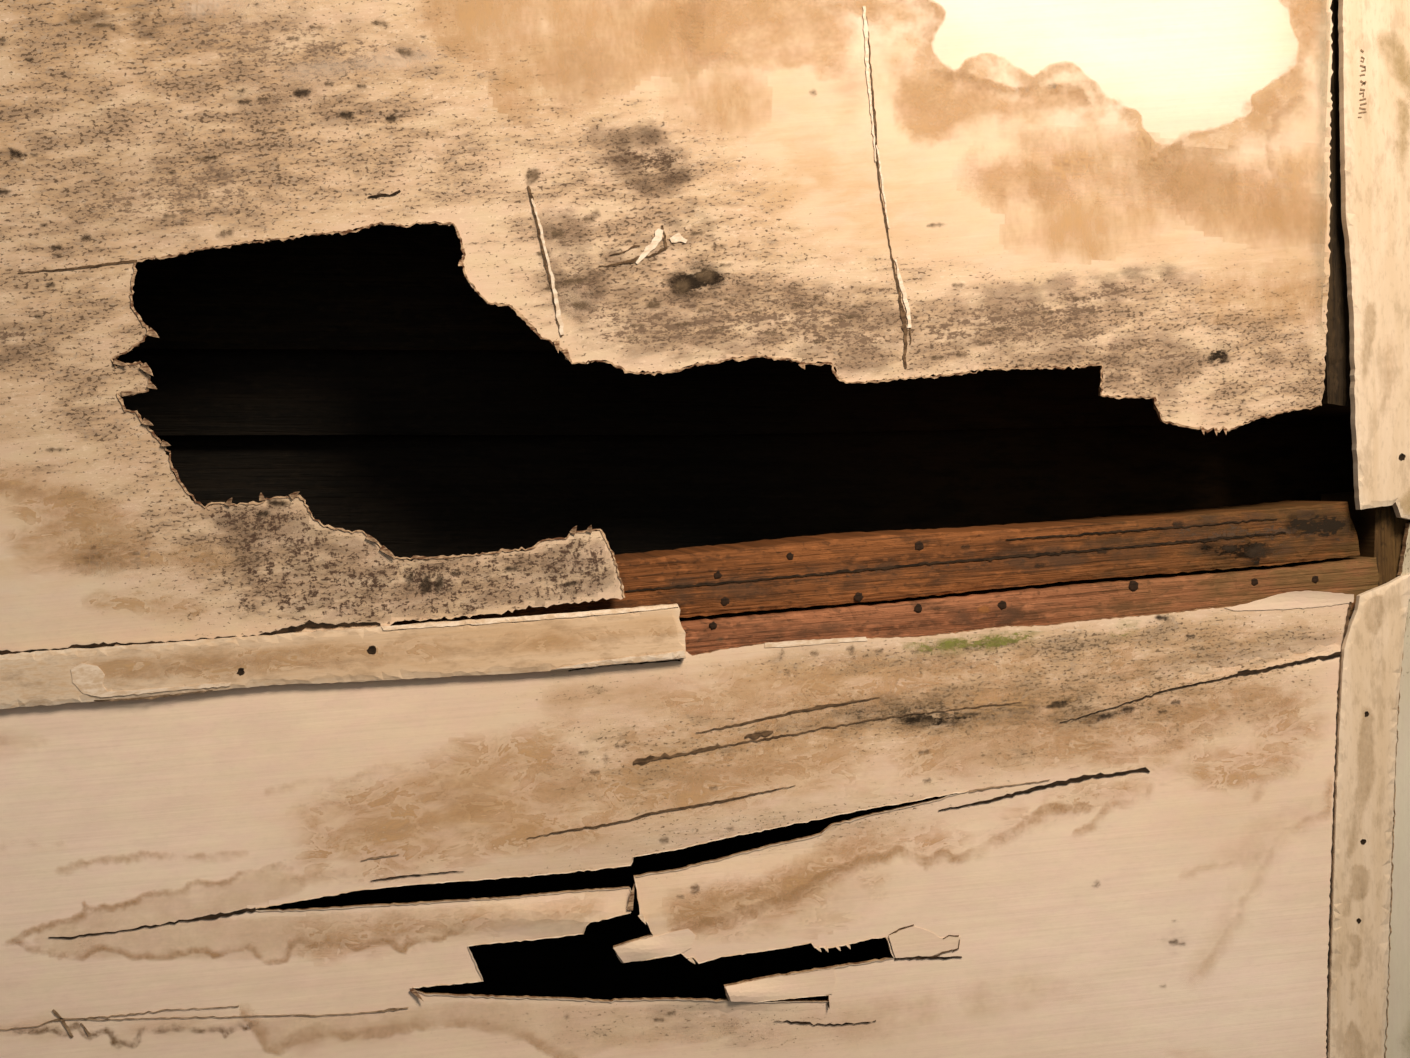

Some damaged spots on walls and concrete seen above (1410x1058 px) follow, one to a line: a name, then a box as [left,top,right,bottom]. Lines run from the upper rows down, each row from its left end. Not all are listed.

damp [181,12,410,118]
crack [863,6,912,368]
crack [527,186,565,337]
damp [538,212,883,365]
damp [915,276,1228,390]
crack [0,620,381,655]
mould [210,500,610,620]
peeling [382,604,678,630]
peeling [764,637,868,648]
peeling [1226,591,1354,611]
crack [633,697,1019,765]
crack [526,785,796,839]